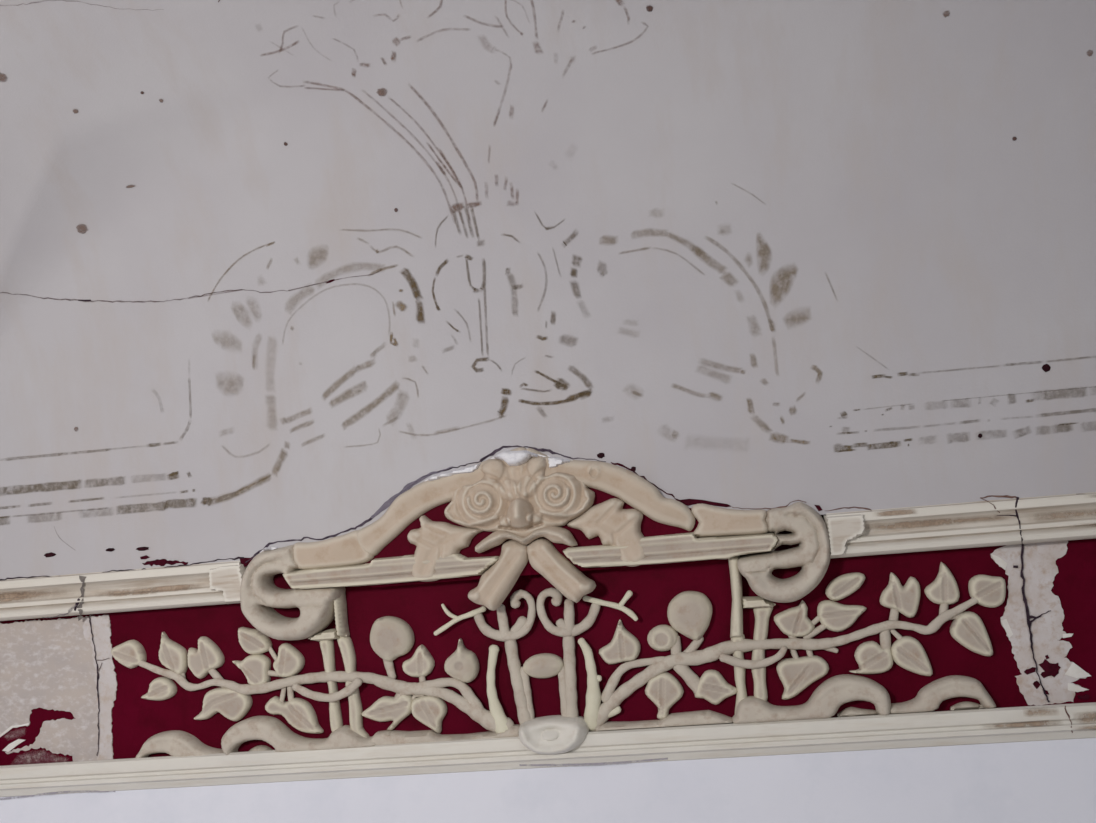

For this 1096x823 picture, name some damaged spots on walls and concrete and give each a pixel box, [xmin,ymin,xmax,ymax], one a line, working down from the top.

crack [1,271,379,303]
crack [0,574,53,582]
peeling [0,615,118,763]
crack [43,445,872,756]
crack [980,495,1073,733]
peeling [991,541,1091,727]